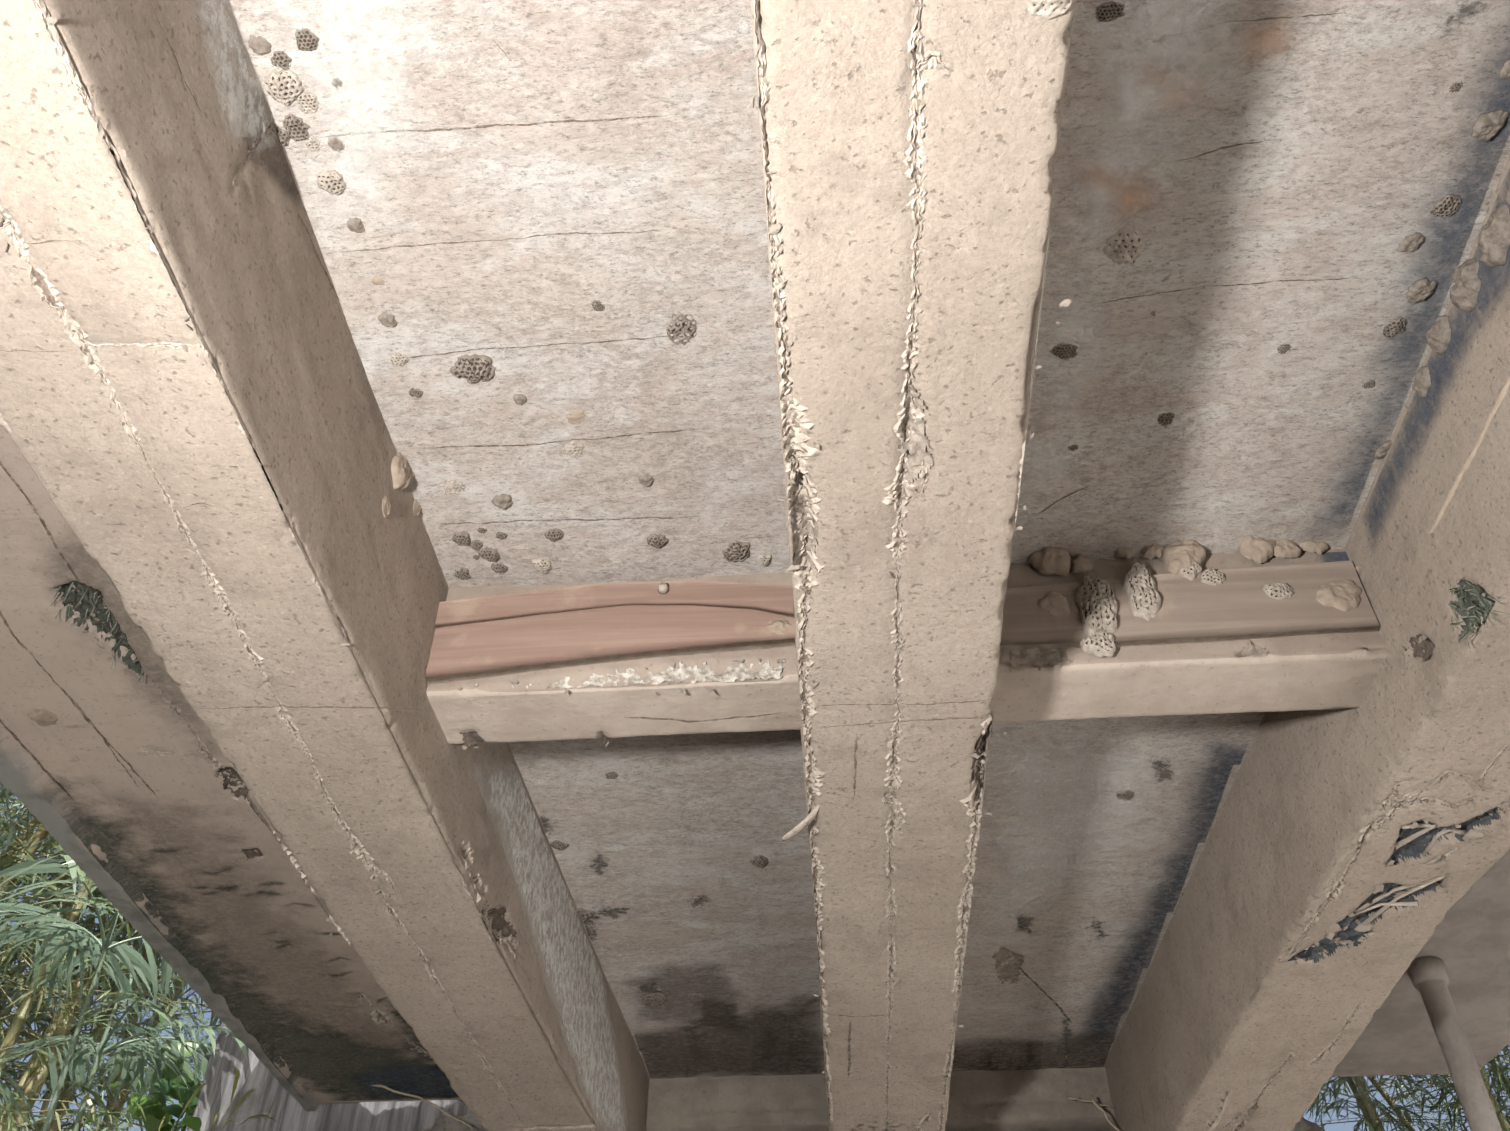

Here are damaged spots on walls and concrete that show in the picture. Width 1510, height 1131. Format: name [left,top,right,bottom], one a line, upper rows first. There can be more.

water stain [1338,80,1510,529]
crack [0,206,596,1131]
spalling [31,0,599,1131]
crack [624,0,993,1131]
crack [1036,486,1088,516]
spalling [1400,633,1435,661]
spalling [1448,577,1510,652]
water stain [71,817,460,1101]
spalling [591,855,608,875]
crack [1020,967,1072,1023]
spalling [1285,805,1510,968]
crack [1363,742,1510,835]